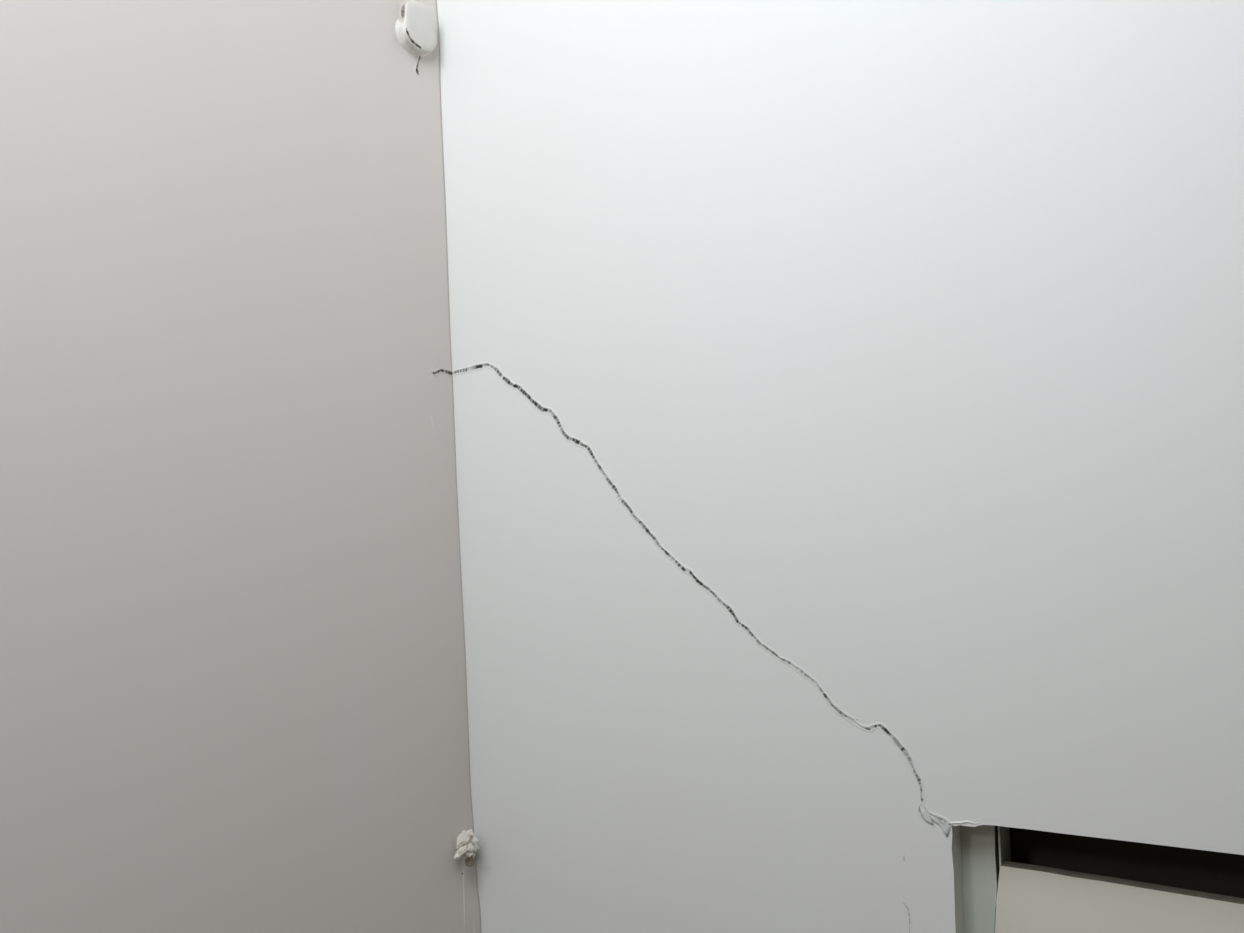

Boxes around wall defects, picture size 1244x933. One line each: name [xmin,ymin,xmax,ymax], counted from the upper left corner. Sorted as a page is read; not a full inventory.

crack [431,362,952,827]